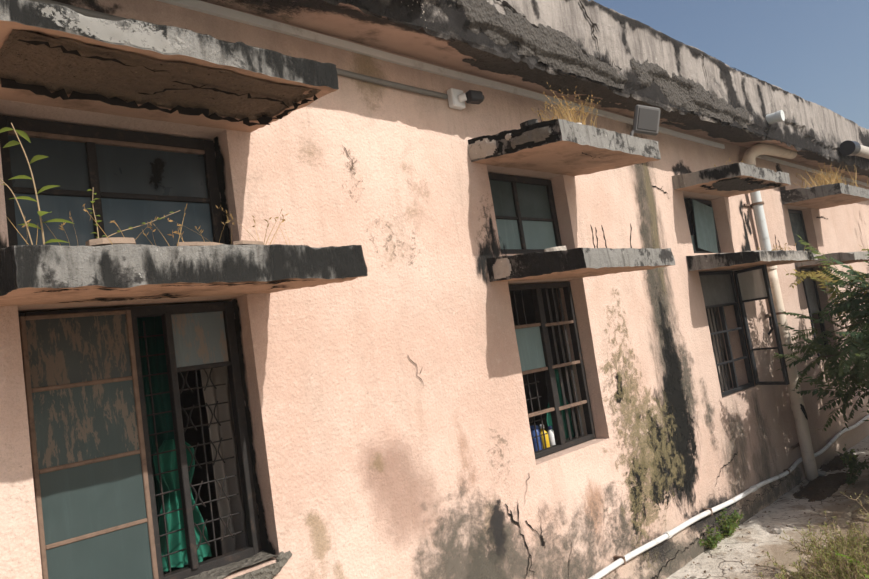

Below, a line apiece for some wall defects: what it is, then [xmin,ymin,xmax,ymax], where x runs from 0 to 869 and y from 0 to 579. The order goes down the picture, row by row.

leakage [0,0,187,53]
spalling [0,29,321,126]
peeling [447,0,767,143]
leakage [529,0,823,153]
peeling [468,119,552,160]
leakage [0,136,368,303]
leakage [477,218,586,283]
leakage [715,201,791,266]
leakage [634,267,802,579]
peeling [276,551,292,563]
leakage [417,499,618,579]
crack [505,475,545,579]